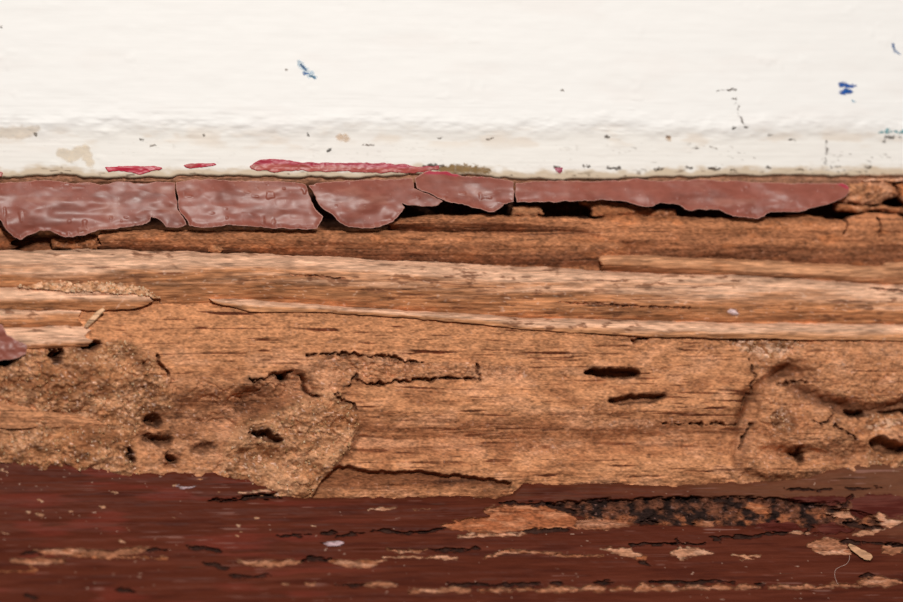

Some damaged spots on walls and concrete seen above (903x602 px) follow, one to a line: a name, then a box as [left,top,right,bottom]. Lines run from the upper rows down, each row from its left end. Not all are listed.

peeling [0,170,849,240]
crack [249,351,482,411]
crack [814,414,858,440]
spalling [187,466,903,580]
peeling [3,546,169,573]